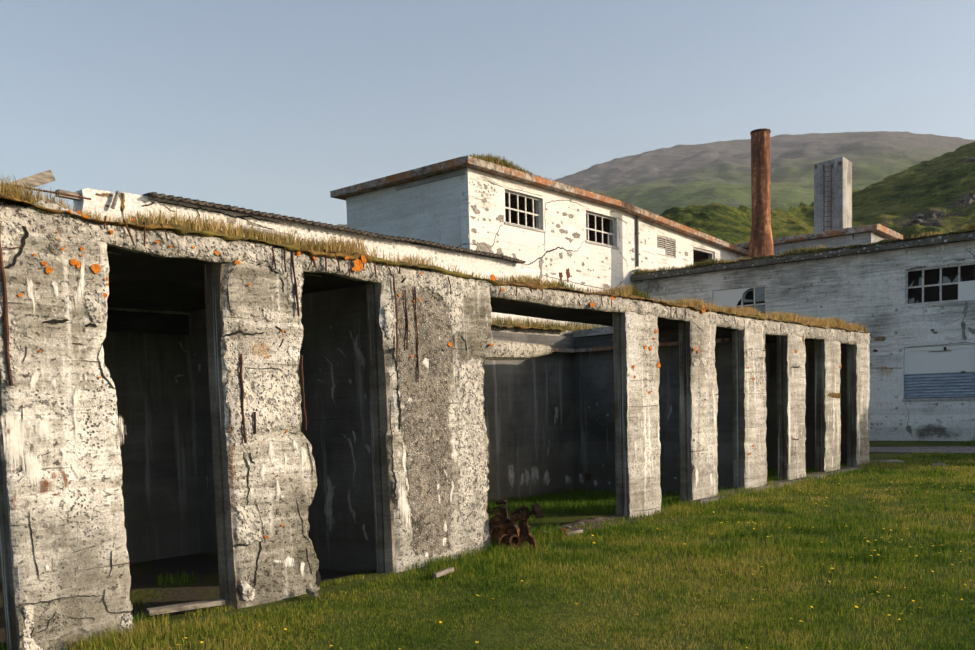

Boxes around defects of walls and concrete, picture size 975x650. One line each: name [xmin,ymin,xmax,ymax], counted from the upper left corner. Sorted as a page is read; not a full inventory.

crack [4,226,29,268]
spalling [468,181,521,259]
spalling [529,207,612,307]
crack [489,181,689,290]
crack [42,319,116,390]
spalling [961,302,975,340]